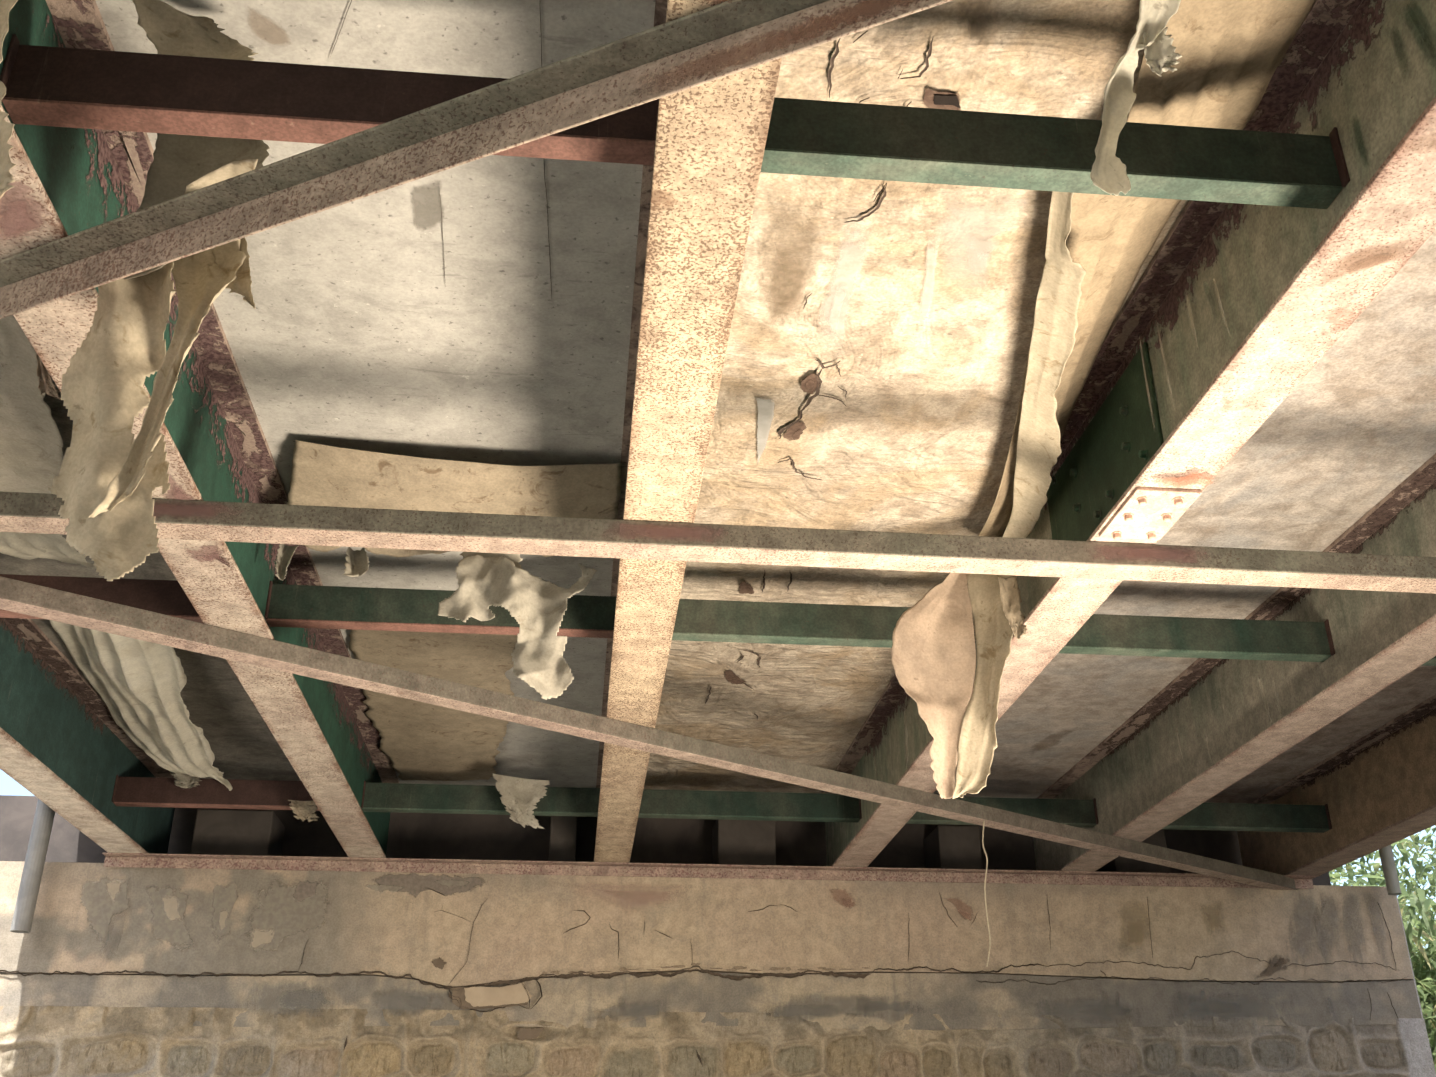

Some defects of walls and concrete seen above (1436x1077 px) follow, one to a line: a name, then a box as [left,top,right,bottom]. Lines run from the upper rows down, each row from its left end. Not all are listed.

crack [828,31,870,103]
crack [898,38,933,107]
rust [1243,0,1388,134]
rust [1050,201,1256,477]
crack [778,359,847,480]
rust [1329,459,1436,554]
rust [1248,587,1312,621]
peeling [82,878,129,944]
peeling [146,886,194,949]
spalling [432,957,447,969]
spalling [451,978,542,1010]
crack [0,899,1407,1020]